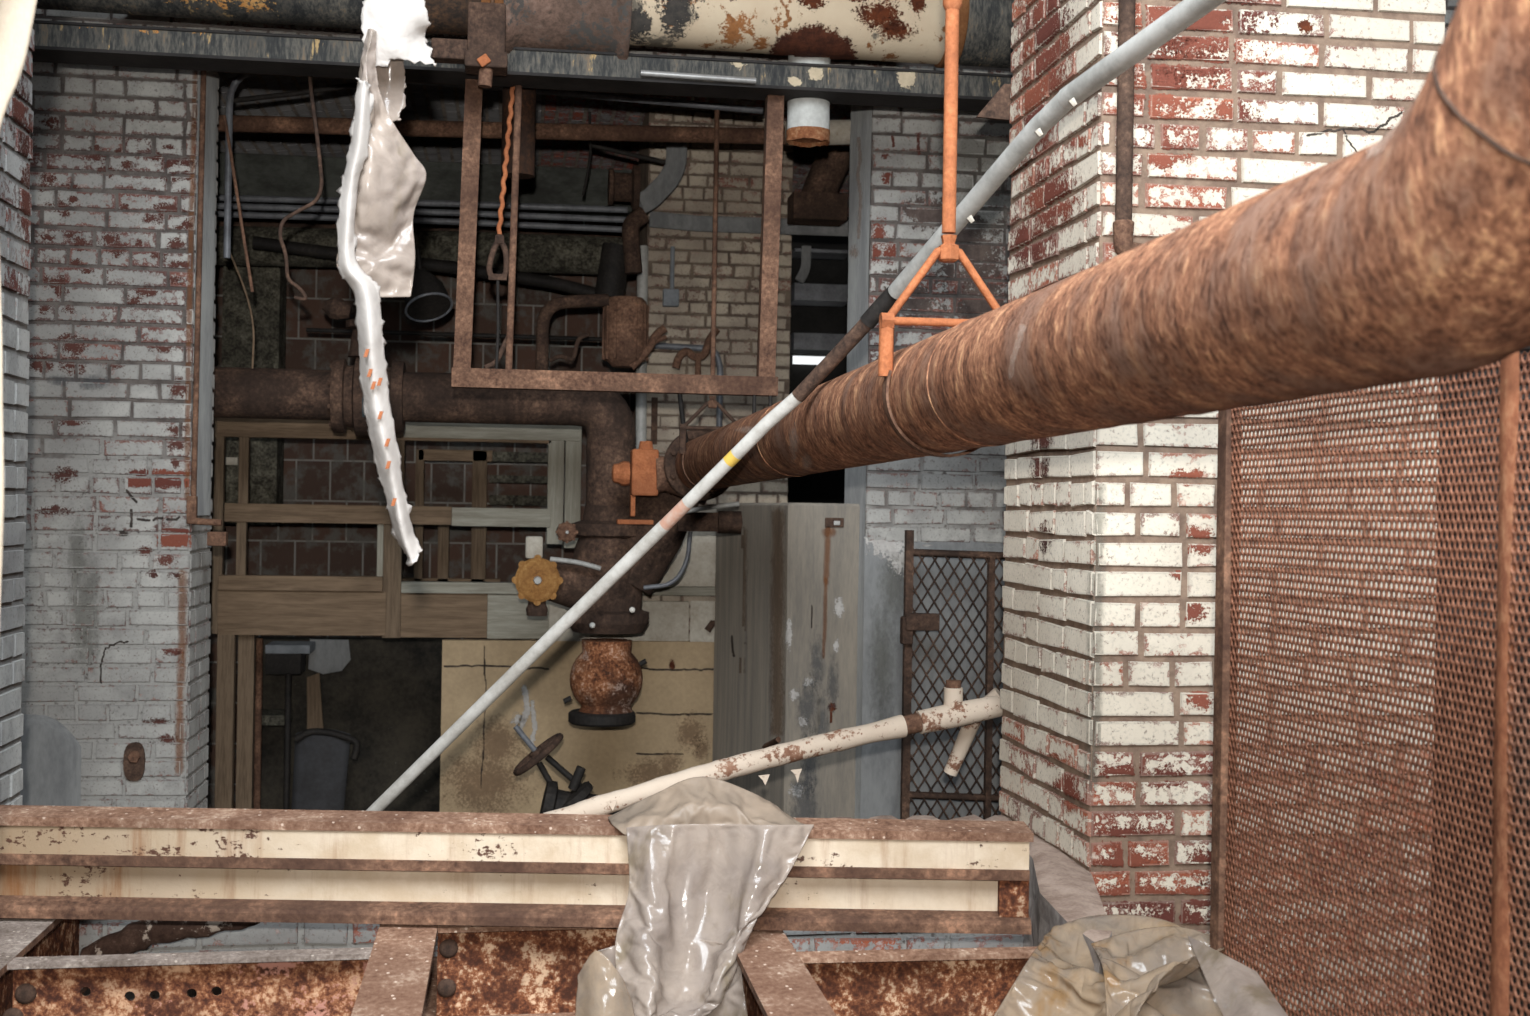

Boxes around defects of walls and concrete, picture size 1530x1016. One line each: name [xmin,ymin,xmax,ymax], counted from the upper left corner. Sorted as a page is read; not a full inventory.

peeling [1102,0,1182,51]
peeling [1133,0,1281,172]
spalling [9,73,197,315]
spalling [28,333,88,376]
spalling [48,466,79,484]
peeling [128,423,191,490]
spalling [37,505,75,515]
peeling [136,528,192,579]
spalling [143,717,178,745]
peeling [1044,752,1086,814]
peeling [1096,762,1188,792]
peeling [1090,821,1211,926]